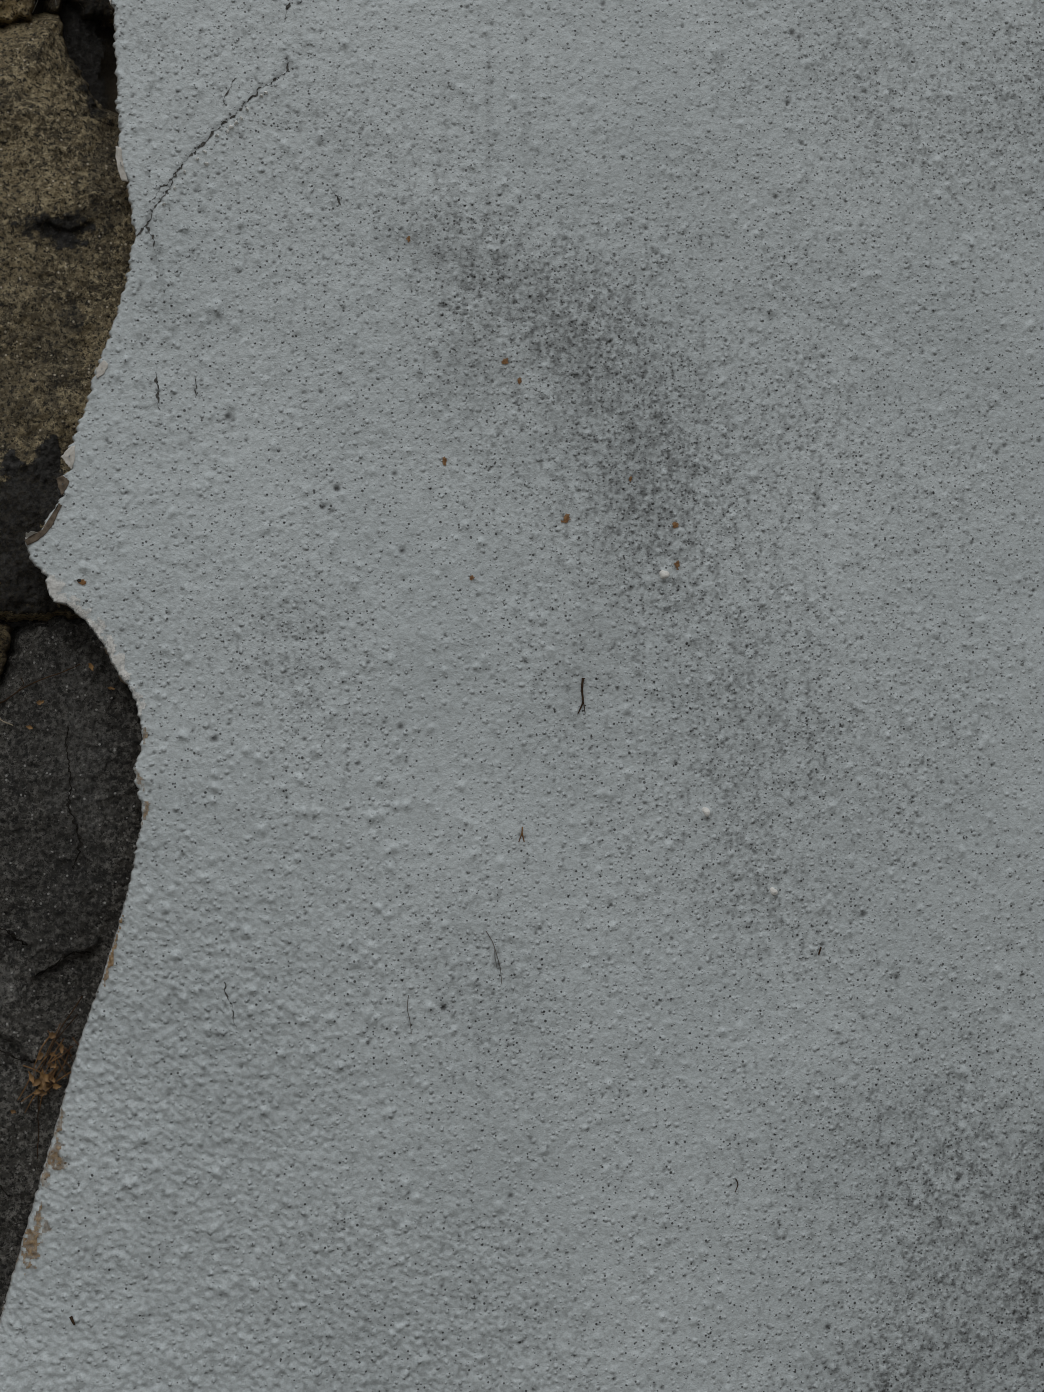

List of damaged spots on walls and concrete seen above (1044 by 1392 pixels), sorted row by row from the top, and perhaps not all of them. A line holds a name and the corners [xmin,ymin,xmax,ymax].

crack [137,58,289,247]